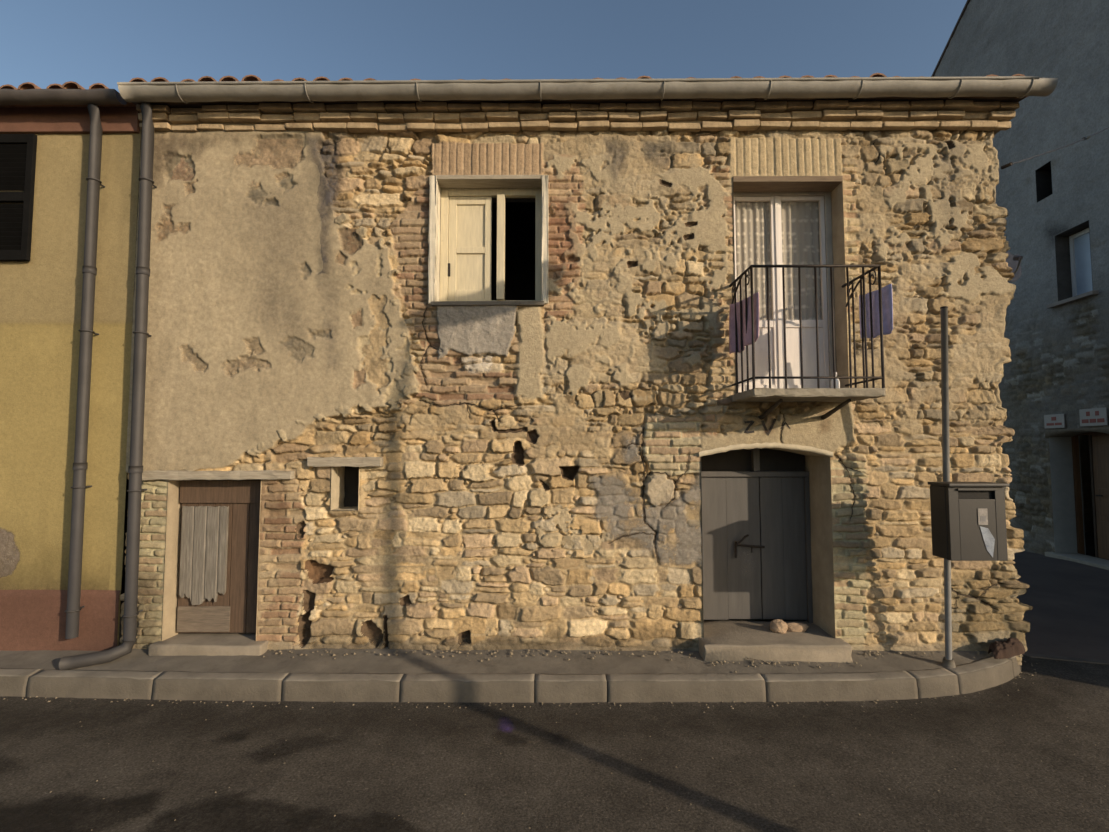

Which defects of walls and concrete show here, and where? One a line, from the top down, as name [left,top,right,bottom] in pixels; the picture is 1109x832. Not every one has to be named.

flaking render [158,205,189,241]
flaking render [334,213,367,265]
flaking render [351,294,420,412]
spalling [489,419,528,433]
spalling [295,521,306,539]
spalling [297,590,316,648]